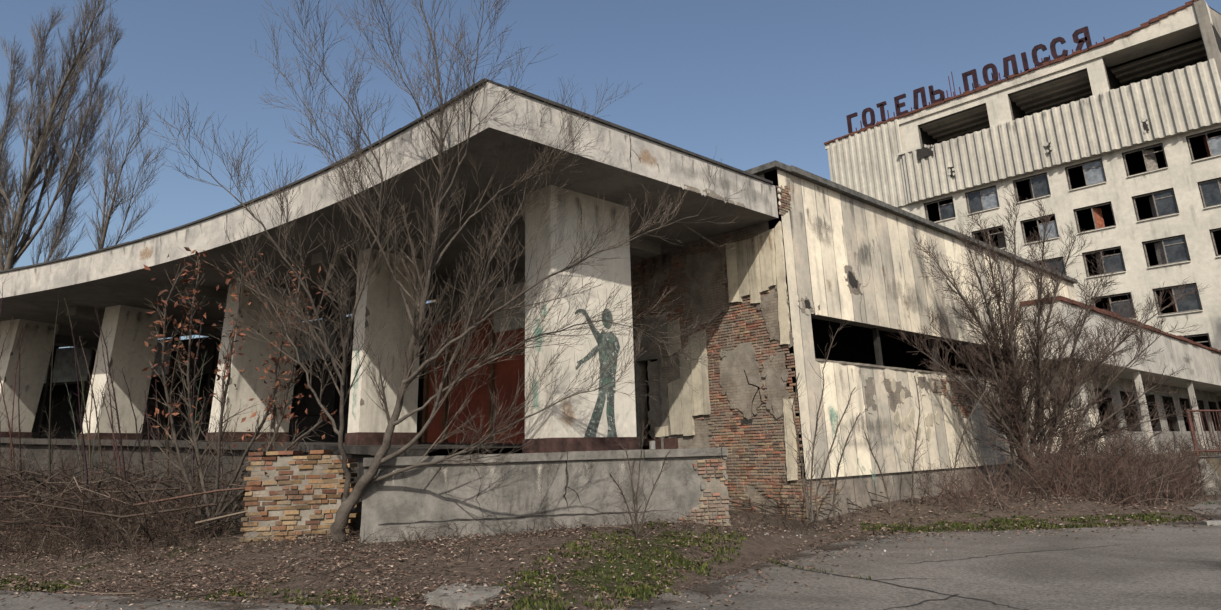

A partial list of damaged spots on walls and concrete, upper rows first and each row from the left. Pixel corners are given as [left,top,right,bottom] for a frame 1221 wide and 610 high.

spalling [631,235,841,528]
crack [768,543,1139,610]